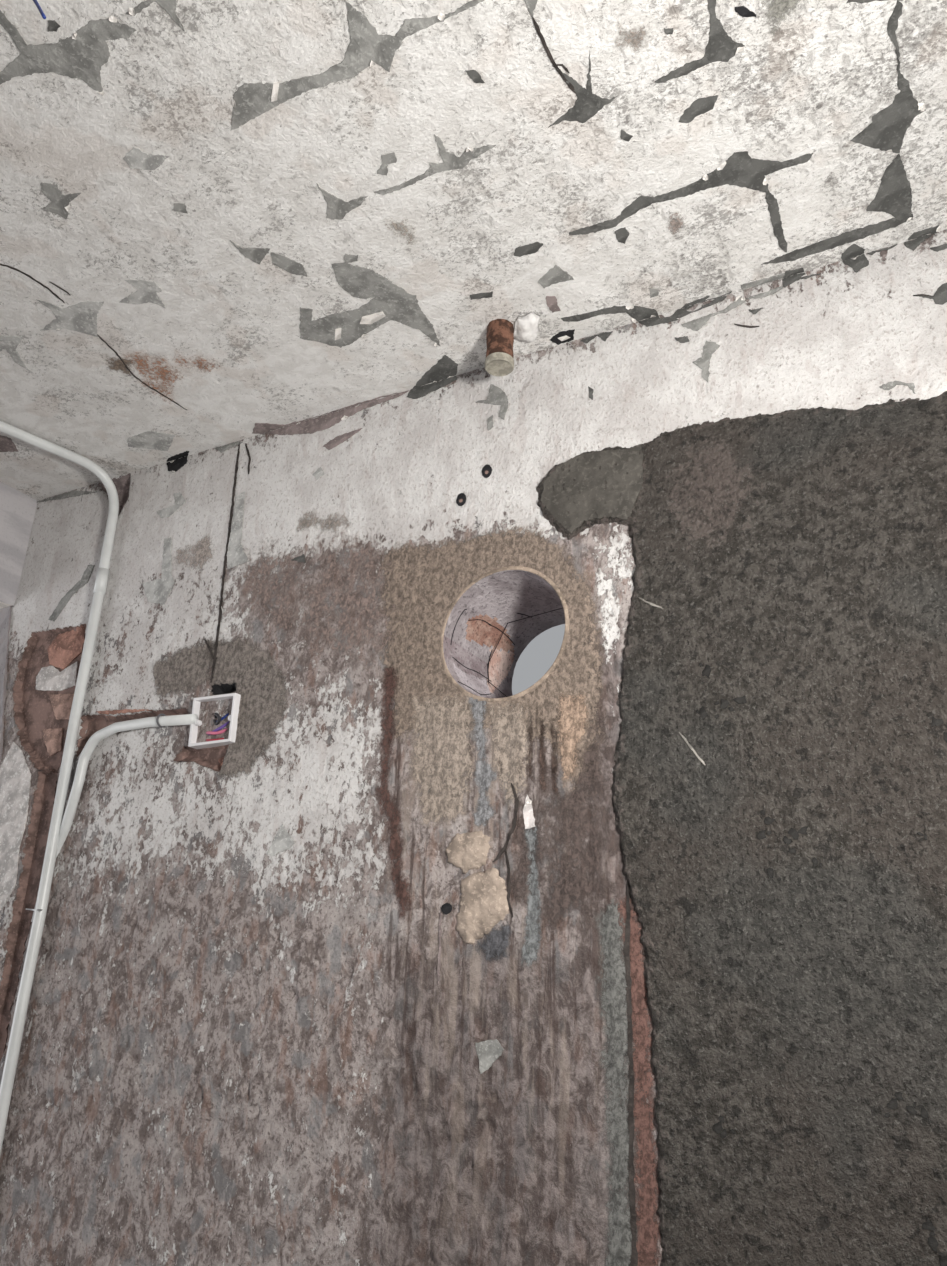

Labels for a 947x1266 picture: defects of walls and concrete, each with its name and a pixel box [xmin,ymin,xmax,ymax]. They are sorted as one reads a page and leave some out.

peeling [0,0,185,95]
peeling [231,0,485,130]
peeling [524,0,537,17]
peeling [538,0,947,382]
peeling [214,254,458,453]
peeling [879,381,915,394]
water stain [153,511,638,1266]
rust [615,900,661,1266]